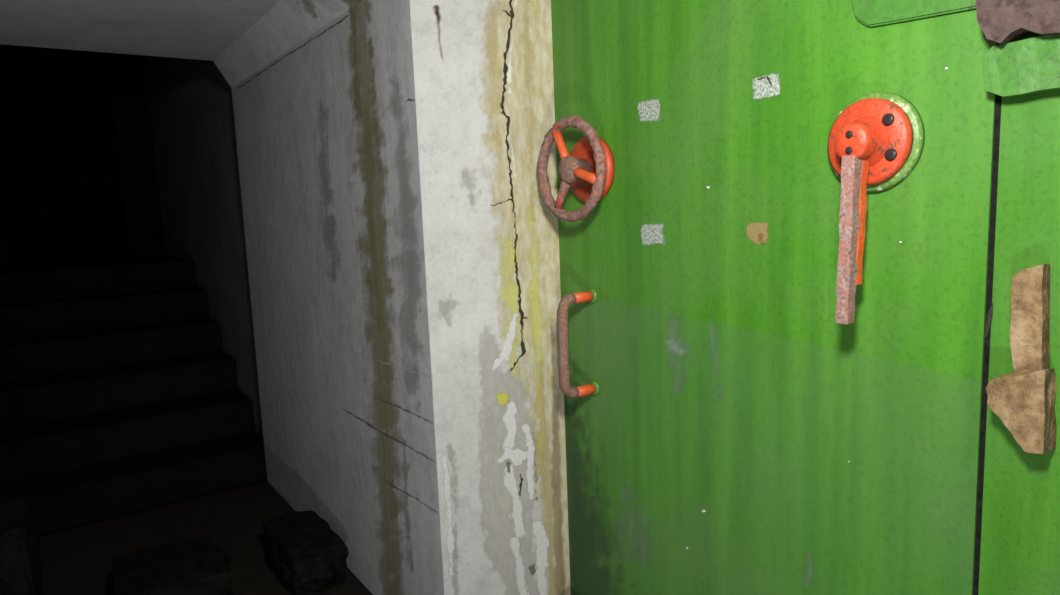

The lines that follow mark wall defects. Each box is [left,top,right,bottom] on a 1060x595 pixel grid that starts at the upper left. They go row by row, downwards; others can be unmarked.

damp [344,0,401,595]
crack [491,0,529,372]
peeling [479,313,549,595]
damp [484,0,571,595]